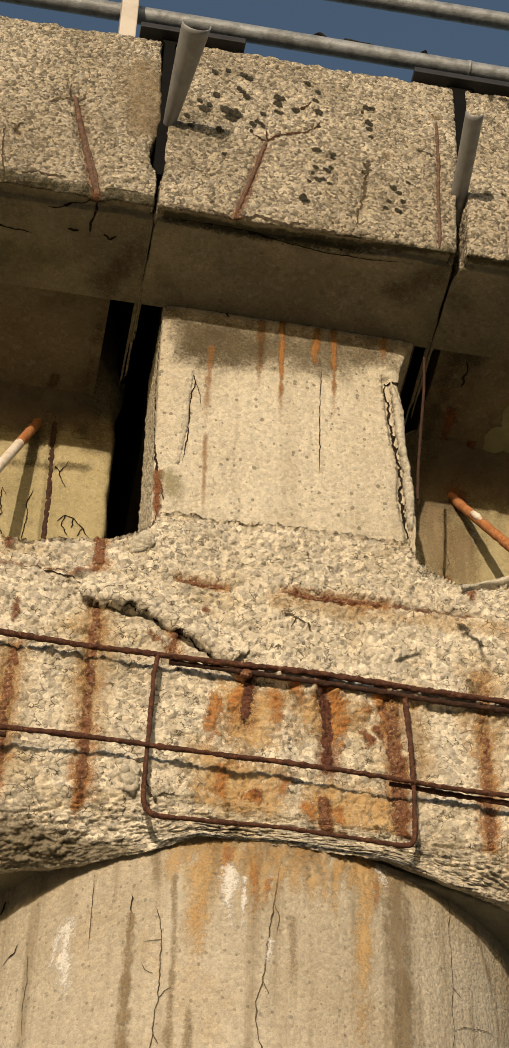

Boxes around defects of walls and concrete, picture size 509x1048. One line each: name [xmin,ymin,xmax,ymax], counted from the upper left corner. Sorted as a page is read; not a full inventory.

crack [154,312,201,519]
damp [168,310,396,376]
corrosion [278,322,286,402]
crack [383,381,409,540]
peeling [128,530,156,553]
peeling [0,536,509,853]
corrosion [191,661,412,839]
damp [48,917,74,995]
damp [116,911,134,1048]
crack [129,896,170,1048]
crack [255,868,280,1048]
corrosion [165,837,413,1048]